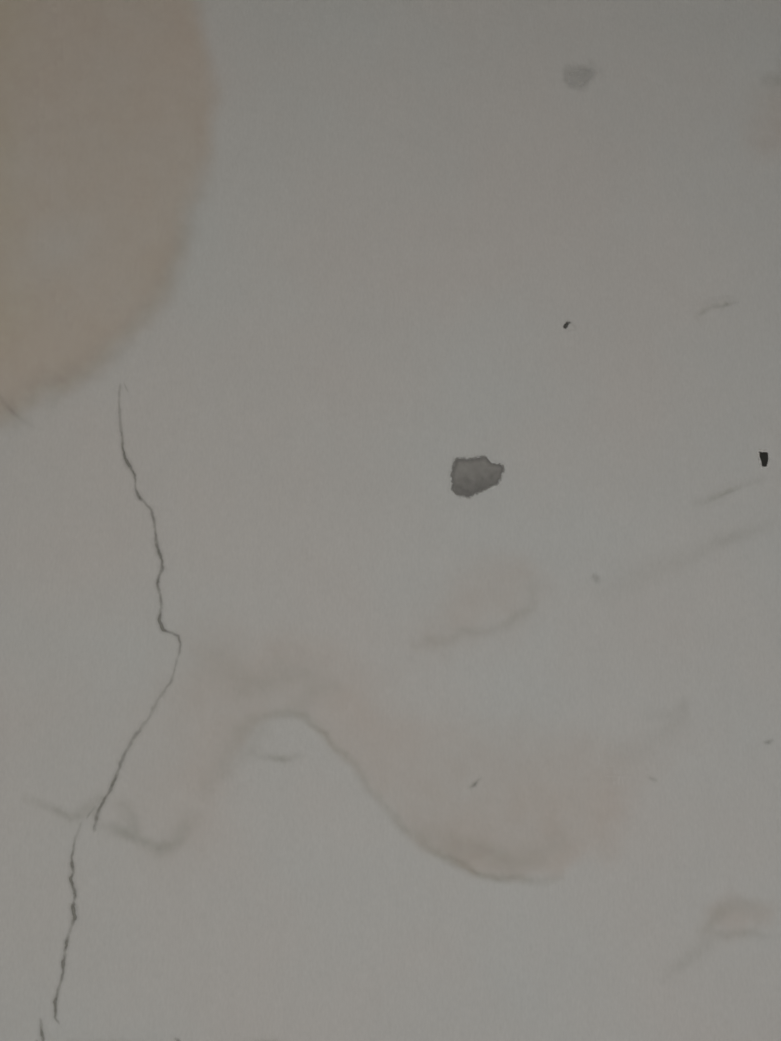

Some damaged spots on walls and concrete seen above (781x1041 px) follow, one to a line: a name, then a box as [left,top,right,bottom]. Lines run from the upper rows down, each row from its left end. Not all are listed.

crack [122,446,141,499]
peeling [448,452,507,501]
crack [62,861,77,969]